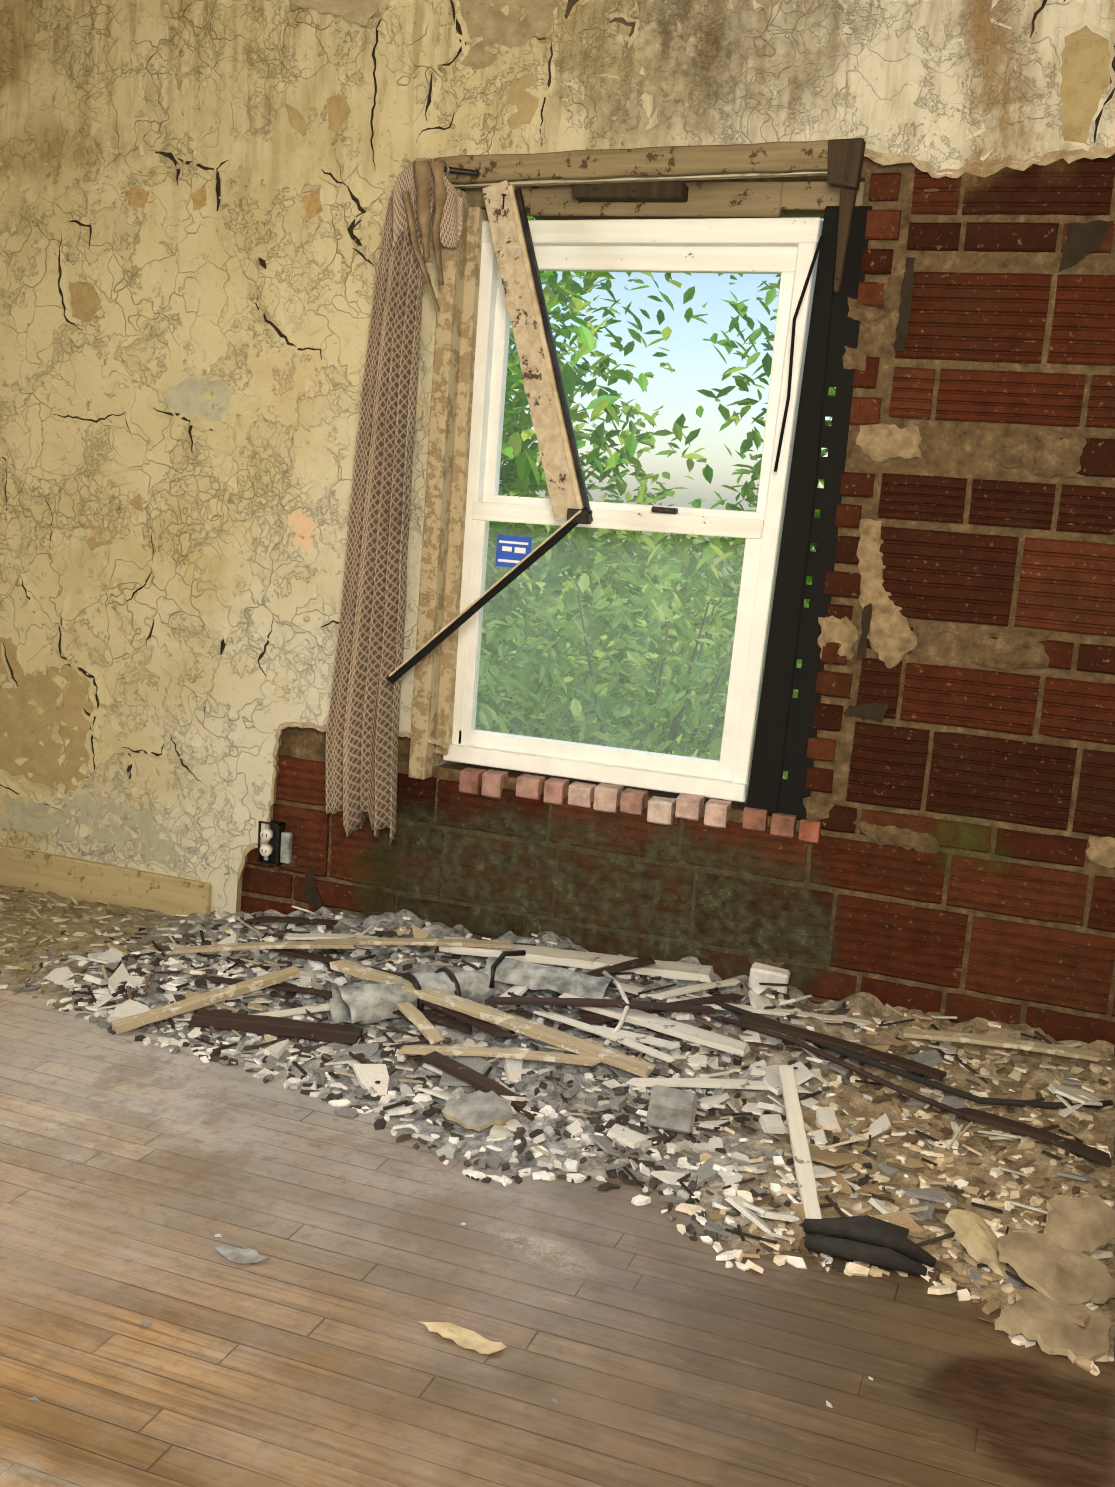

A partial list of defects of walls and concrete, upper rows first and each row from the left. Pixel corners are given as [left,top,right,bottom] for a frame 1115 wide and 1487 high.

crack [150,151,231,211]
crack [318,0,398,266]
crack [416,0,471,146]
leakage [652,0,741,89]
leakage [961,0,1025,175]
crack [58,220,92,330]
crack [251,257,322,360]
crack [52,407,216,454]
spalling [238,0,1115,1056]
crack [0,453,212,810]
peeling [0,632,188,876]
leakage [933,1361,1107,1487]